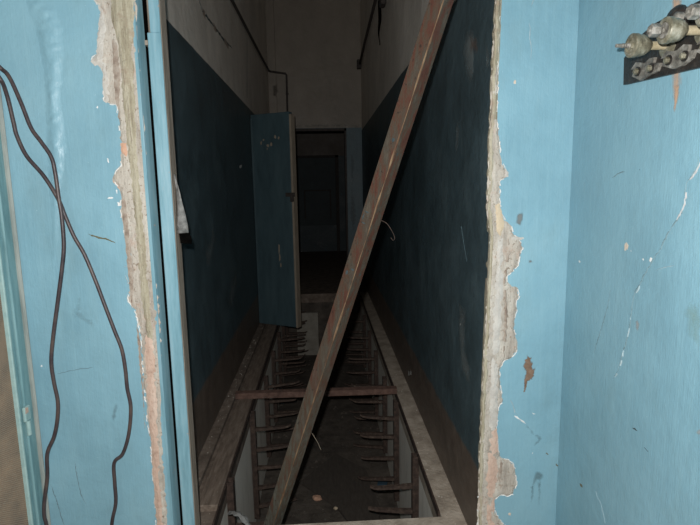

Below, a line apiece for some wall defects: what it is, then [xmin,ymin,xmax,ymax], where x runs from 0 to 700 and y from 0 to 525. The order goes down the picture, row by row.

spalling [91,0,167,525]
spalling [477,0,524,525]
corrosion [523,356,535,392]
crack [614,158,700,377]